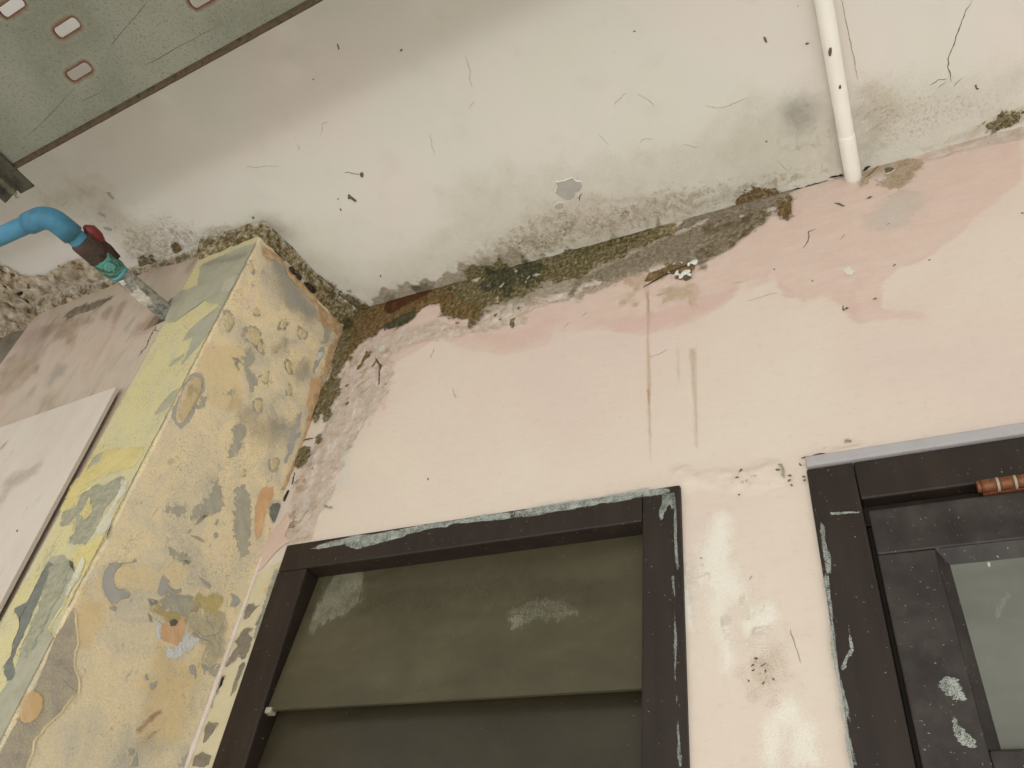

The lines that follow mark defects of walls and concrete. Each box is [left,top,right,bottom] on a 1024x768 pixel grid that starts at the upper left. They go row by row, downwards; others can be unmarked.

crack [931,4,971,86]
peeling [554,177,583,214]
spalling [0,259,106,338]
damp [28,47,1024,501]
spalling [612,244,725,318]
peeling [147,244,603,768]
peeling [0,476,128,768]
peeling [101,558,137,612]